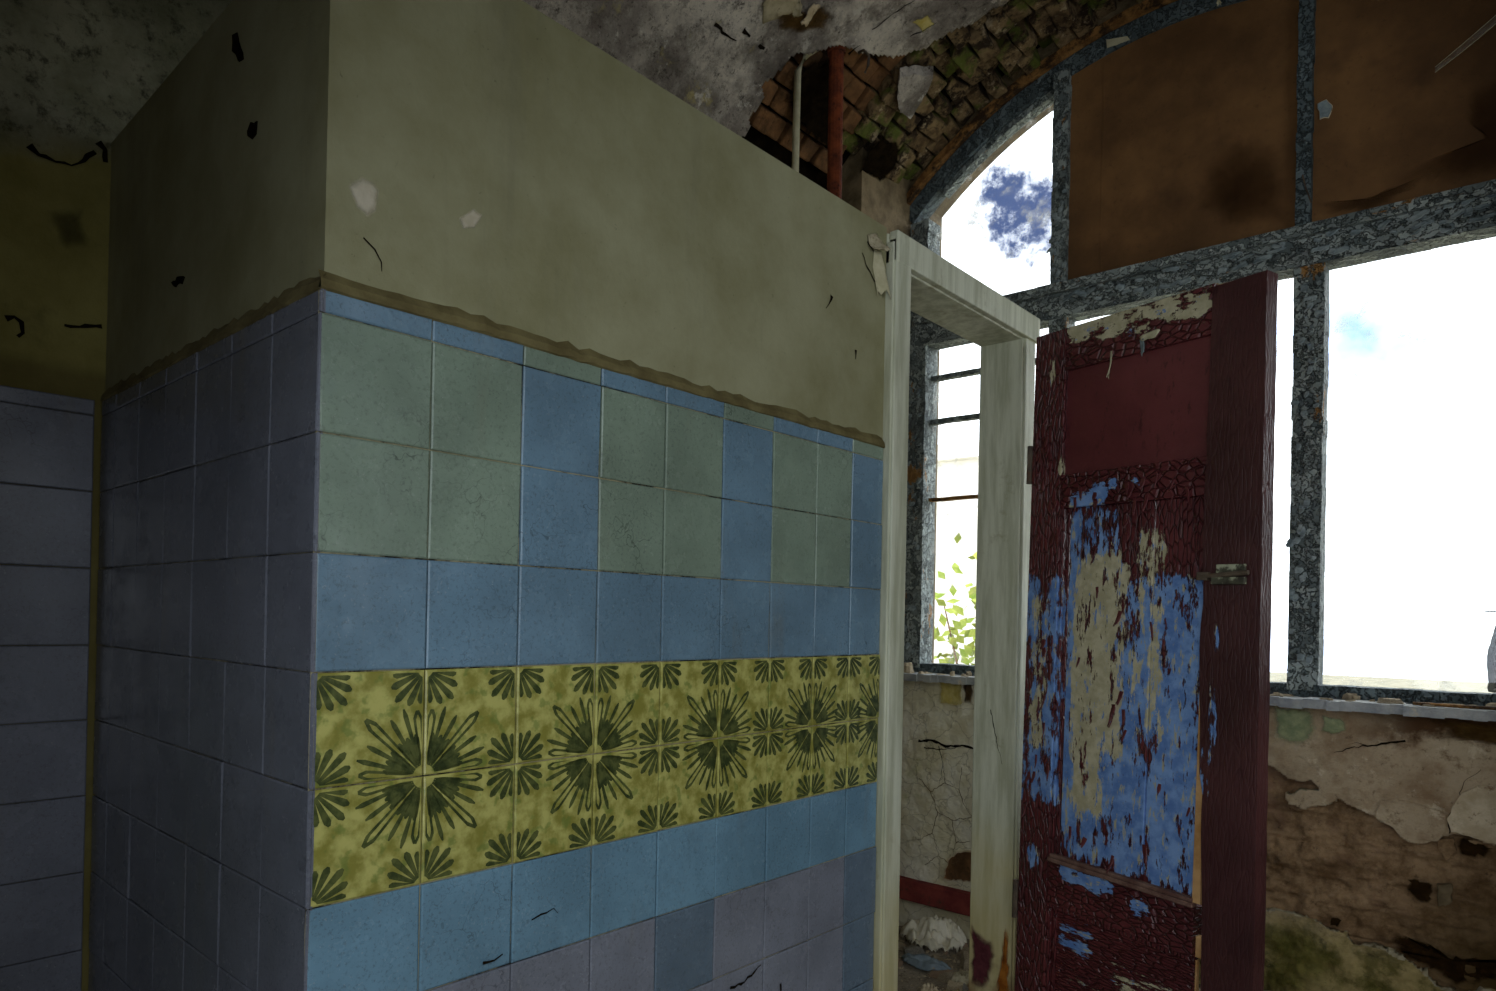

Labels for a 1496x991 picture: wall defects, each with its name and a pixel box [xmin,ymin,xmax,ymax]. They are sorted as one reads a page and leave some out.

spalling [762,0,831,32]
flaking render [748,47,933,173]
spalling [1317,99,1333,119]
spalling [860,137,900,181]
peeling [1310,193,1496,255]
peeling [1285,280,1324,611]
peeling [1286,649,1316,673]
peeling [1025,694,1049,785]
peeling [1107,691,1127,742]
spalling [942,850,971,882]
spalling [1266,765,1496,991]